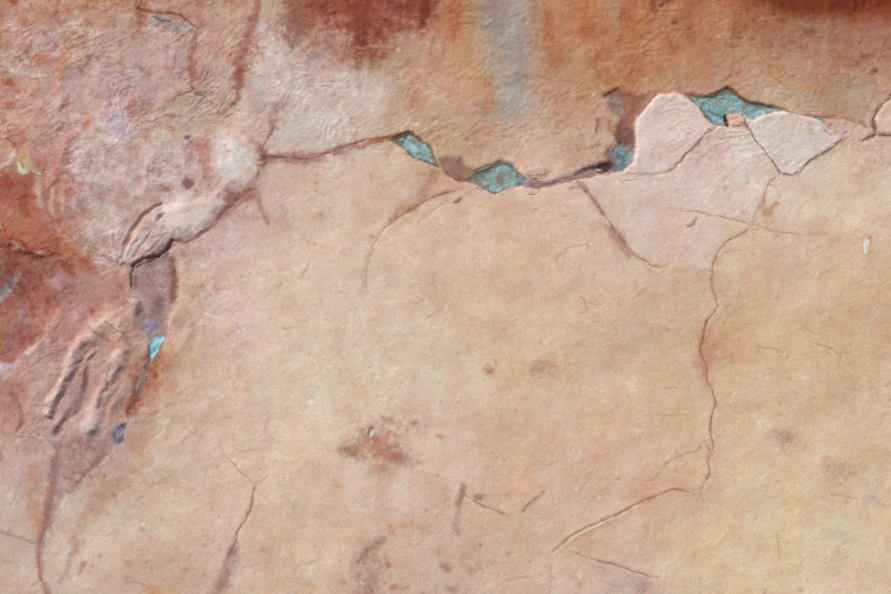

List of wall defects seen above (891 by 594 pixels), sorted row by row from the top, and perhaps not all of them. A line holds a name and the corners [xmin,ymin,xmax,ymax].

rust [226,0,466,116]
rust [539,0,891,94]
spalling [0,220,85,370]
water stain [29,169,73,247]
spalling [59,90,244,392]
crack [523,166,672,275]
peeling [387,84,891,275]
crack [549,92,891,594]
spalling [111,420,129,447]
crack [0,502,55,594]